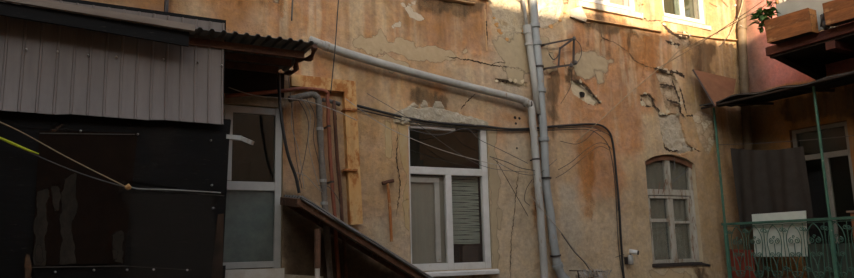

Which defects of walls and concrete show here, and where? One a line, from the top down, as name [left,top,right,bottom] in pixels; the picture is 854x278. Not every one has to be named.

peeling [488,0,566,87]
flaking render [640,70,694,154]